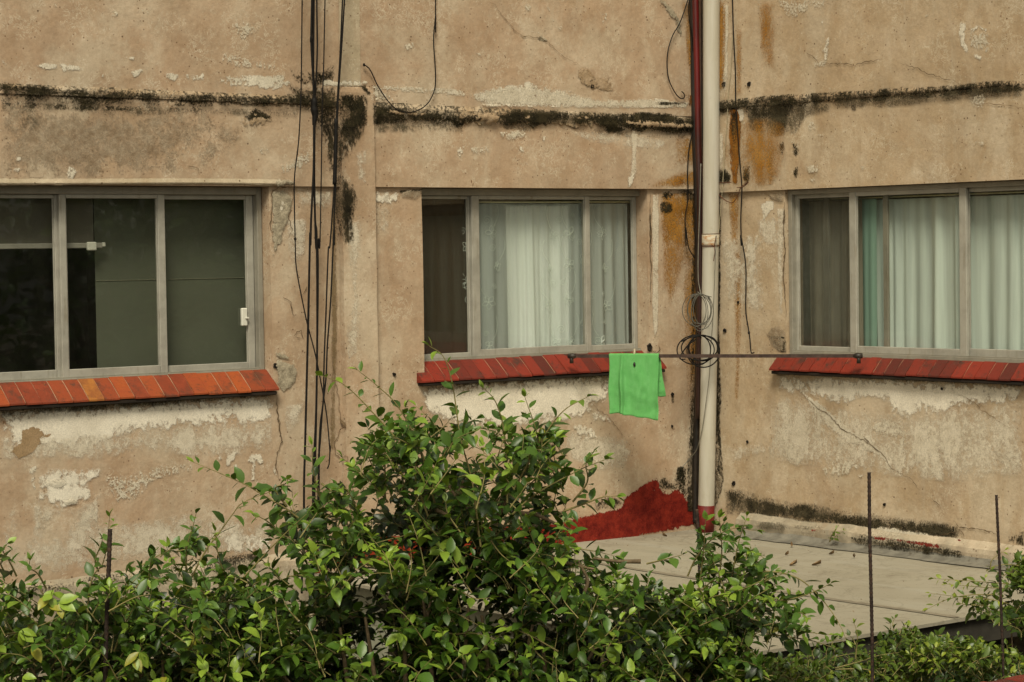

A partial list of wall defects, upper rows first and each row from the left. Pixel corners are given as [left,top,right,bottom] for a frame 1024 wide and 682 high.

rust [720,5,741,92]
rust [760,6,773,63]
damp [2,67,694,242]
damp [719,81,1021,178]
rust [656,138,696,382]
peeling [724,193,784,312]
peeling [3,397,273,527]
crack [275,402,283,479]
peeling [423,377,630,469]
damp [715,169,962,558]
peeling [735,377,1021,682]
crack [802,394,994,536]